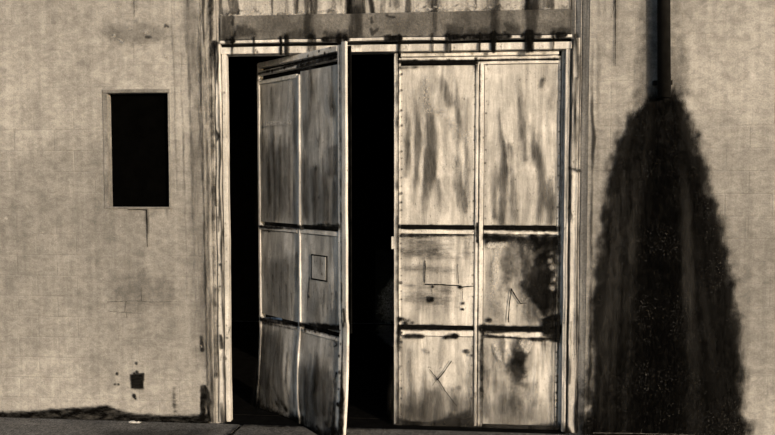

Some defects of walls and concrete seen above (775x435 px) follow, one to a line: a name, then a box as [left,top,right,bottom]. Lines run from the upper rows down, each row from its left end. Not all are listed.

water stain [294,0,317,36]
water stain [346,0,382,45]
water stain [492,0,500,31]
water stain [525,0,555,33]
water stain [579,64,754,435]